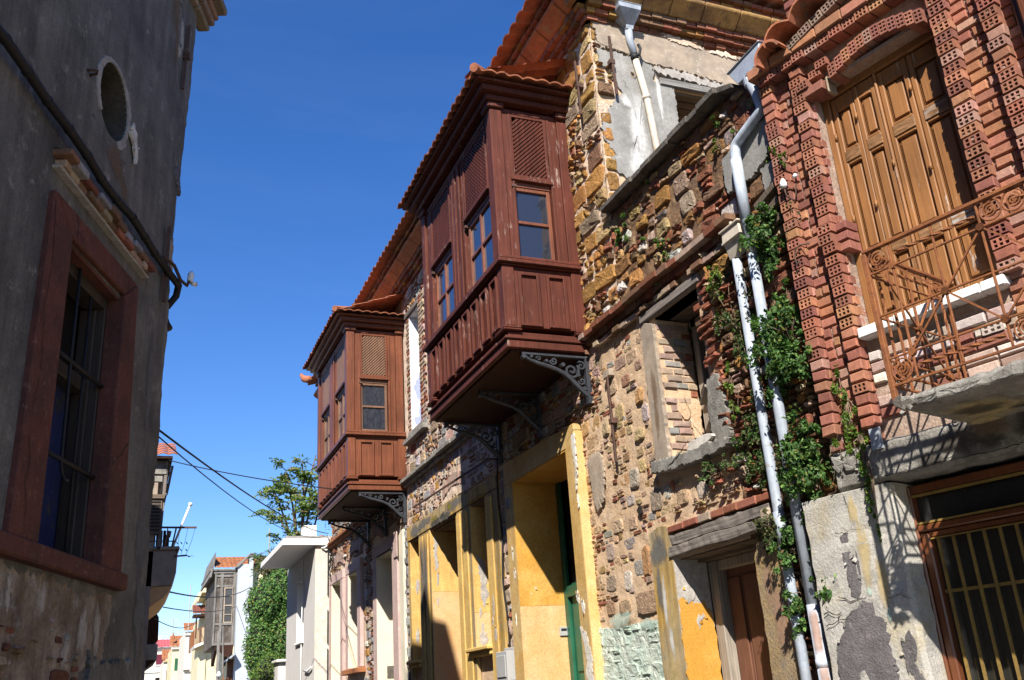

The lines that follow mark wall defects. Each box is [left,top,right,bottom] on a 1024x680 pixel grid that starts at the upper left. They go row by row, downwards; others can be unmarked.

peeling [683,584,695,604]
flaking render [836,533,926,680]